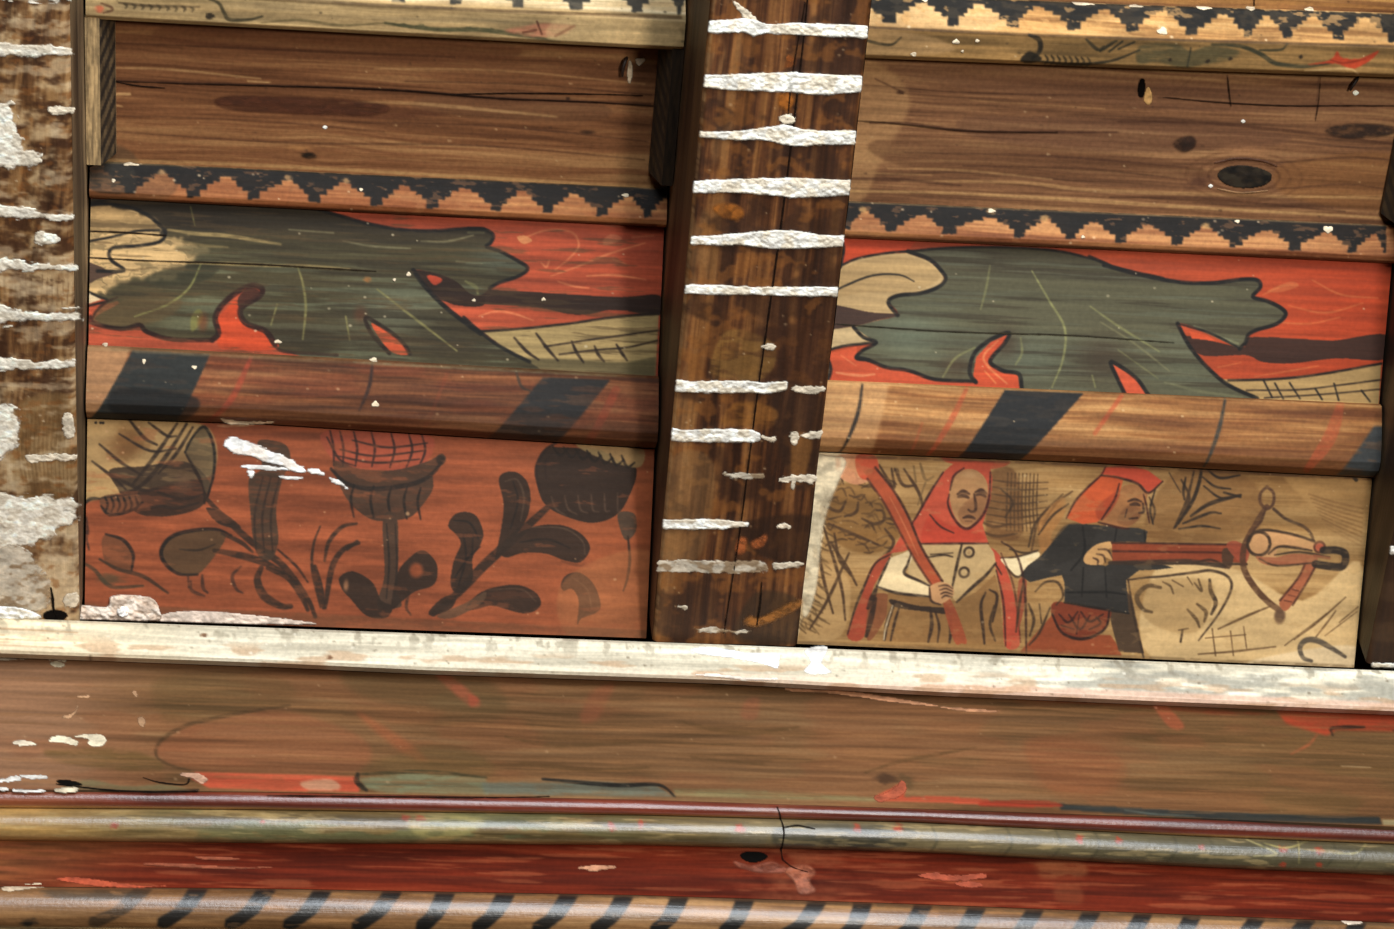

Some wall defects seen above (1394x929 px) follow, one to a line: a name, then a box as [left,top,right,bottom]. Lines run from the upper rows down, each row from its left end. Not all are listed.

peeling [13,734,107,746]
peeling [0,775,48,793]